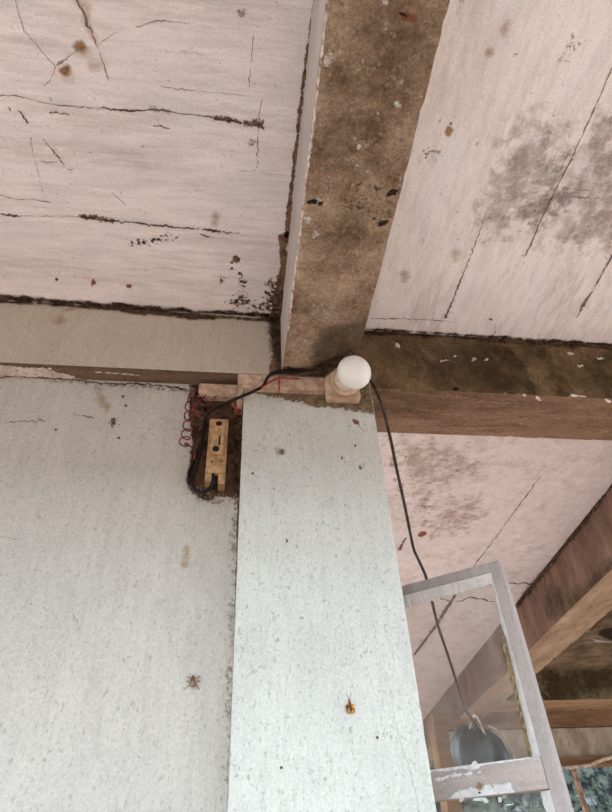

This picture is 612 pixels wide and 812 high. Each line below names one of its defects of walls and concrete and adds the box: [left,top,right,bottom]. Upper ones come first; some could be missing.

crack [0,0,265,174]
crack [522,68,612,256]
crack [0,193,239,238]
crack [371,214,486,323]
crack [577,254,612,317]
crack [473,477,540,567]
crack [413,595,494,655]
peeling [430,757,530,803]